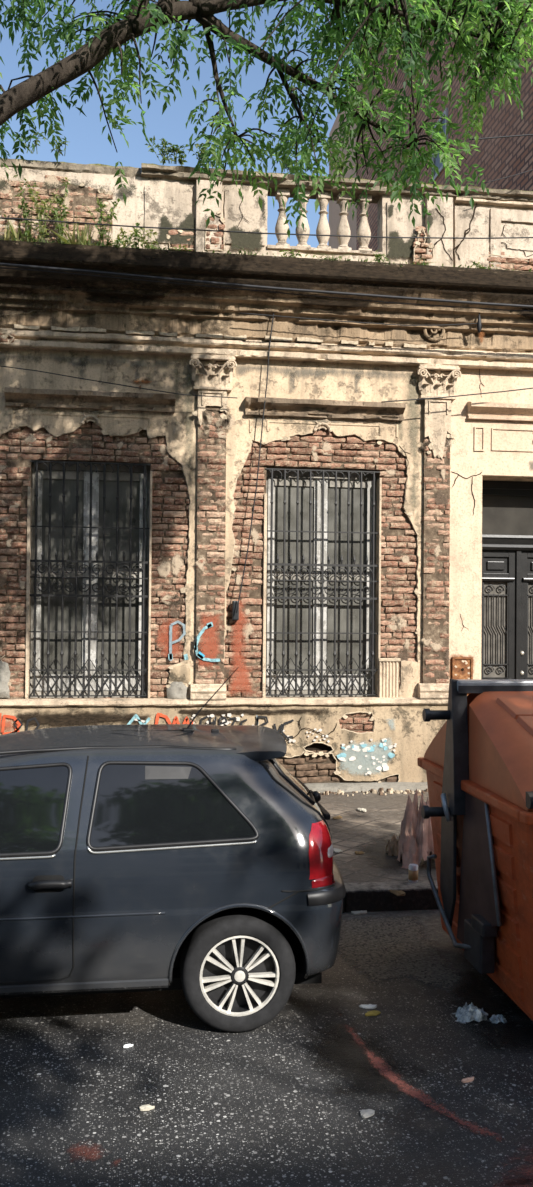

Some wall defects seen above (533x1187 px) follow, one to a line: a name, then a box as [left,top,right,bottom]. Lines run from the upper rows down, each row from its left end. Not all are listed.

flaking render [0,172,114,246]
flaking render [0,402,470,699]
peeling [191,713,244,726]
flaking render [276,711,400,783]